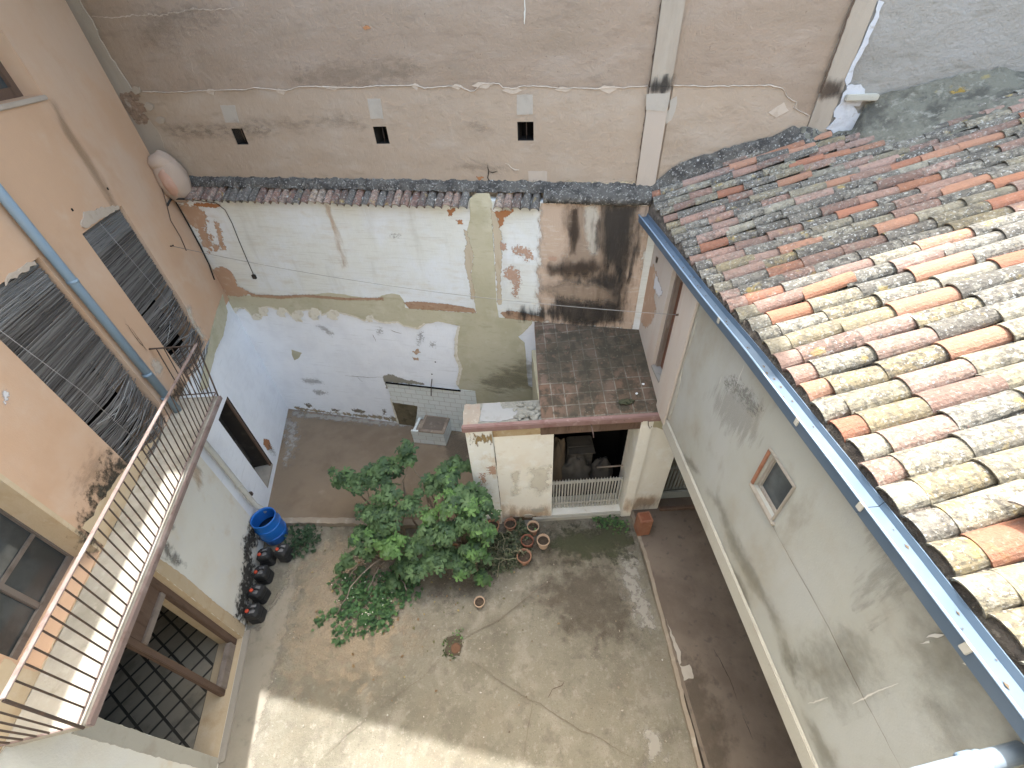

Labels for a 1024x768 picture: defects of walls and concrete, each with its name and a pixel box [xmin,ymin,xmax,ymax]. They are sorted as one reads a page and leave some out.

damp [820,0,884,98]
peeling [120,82,648,125]
damp [651,74,672,94]
peeling [71,205,120,228]
peeling [178,202,226,254]
peeling [490,208,544,322]
damp [520,203,649,329]
spalling [294,403,397,422]
damp [75,450,129,553]